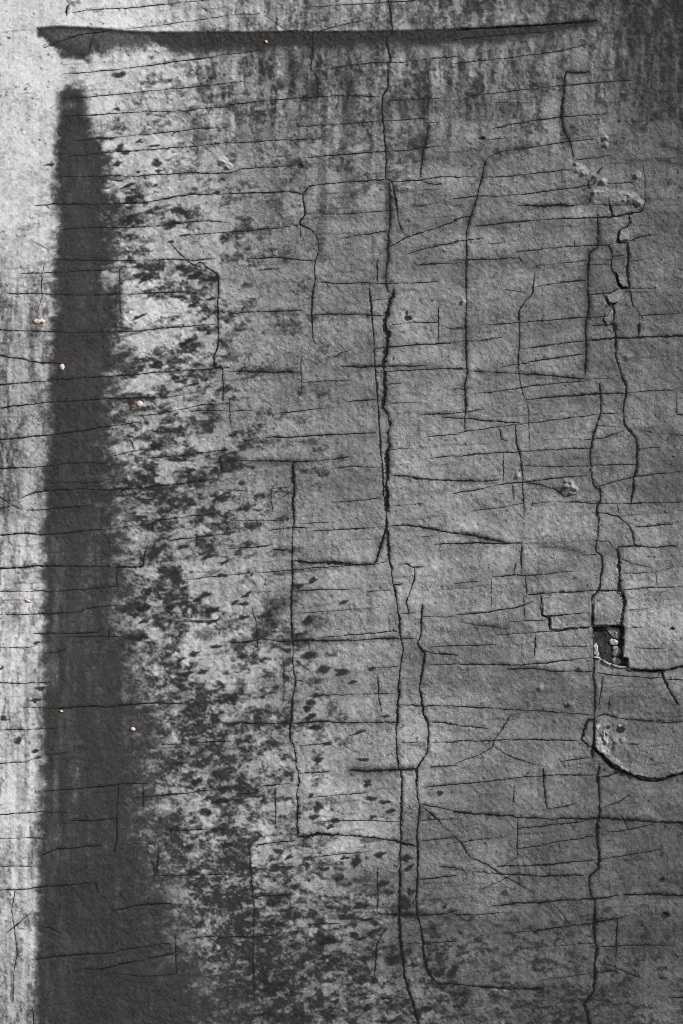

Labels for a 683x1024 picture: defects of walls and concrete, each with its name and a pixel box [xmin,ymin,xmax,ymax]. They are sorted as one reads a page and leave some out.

crack [43,0,259,74]
crack [74,81,242,98]
crack [69,155,293,177]
crack [67,127,309,157]
crack [0,245,348,440]
crack [0,489,254,536]
damp [34,22,591,1024]
crack [187,0,683,1024]
crack [0,547,147,654]
peeling [542,591,628,668]
crack [0,682,183,764]
crack [5,882,98,999]